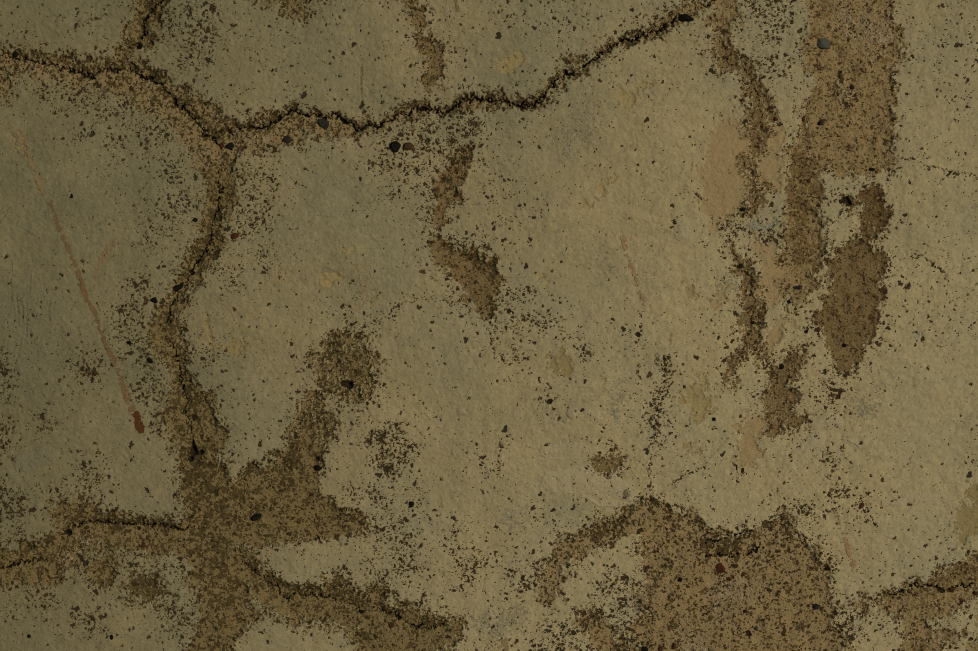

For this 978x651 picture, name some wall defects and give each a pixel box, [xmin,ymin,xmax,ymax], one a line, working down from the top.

crack [1,0,716,454]
crack [733,253,756,364]
crack [0,557,48,569]
crack [69,519,195,531]
peeling [432,521,496,597]
spalling [504,481,978,651]